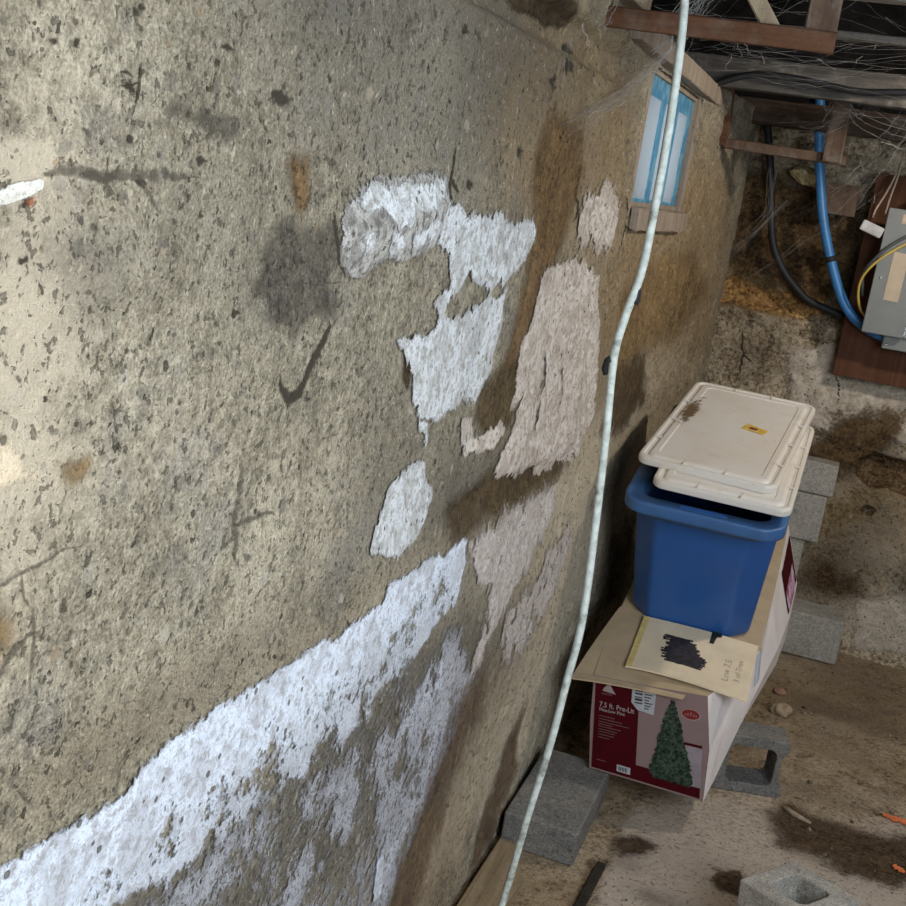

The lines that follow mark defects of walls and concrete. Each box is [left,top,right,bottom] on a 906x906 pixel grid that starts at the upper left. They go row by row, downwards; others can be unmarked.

leakage [508,0,578,28]
crack [44,166,200,214]
corrosion [290,158,310,211]
leakage [255,218,341,333]
peeling [390,173,621,480]
leakage [403,357,411,388]
leakage [144,448,575,906]